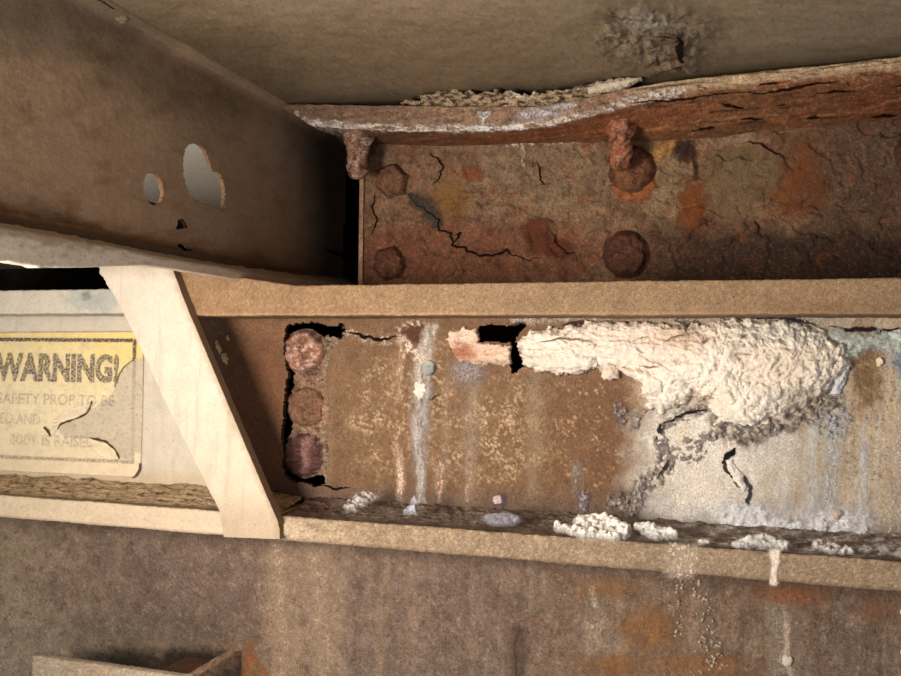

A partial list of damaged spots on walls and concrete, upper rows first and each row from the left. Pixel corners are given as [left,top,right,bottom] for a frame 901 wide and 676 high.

spalling [594,1,712,78]
corrosion [401,77,643,107]
crack [634,81,854,159]
corrosion [650,142,678,163]
corrosion [611,181,657,202]
peeling [397,321,438,345]
spalling [446,326,512,386]
efflorescence [396,326,444,514]
crack [657,409,709,434]
crack [722,448,756,518]
leakage [344,491,377,509]
leakage [484,495,521,525]